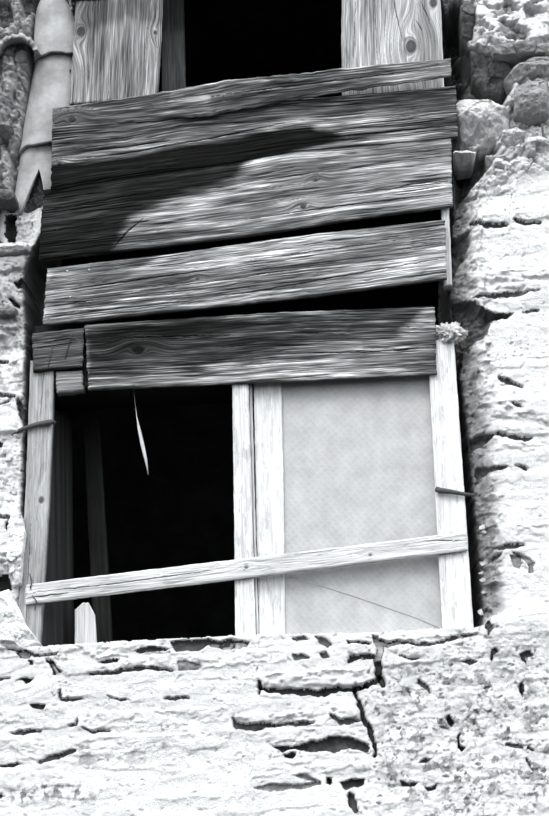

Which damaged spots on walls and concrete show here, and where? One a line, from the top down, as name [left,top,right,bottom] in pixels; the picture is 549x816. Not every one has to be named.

crack [353,634,476,758]